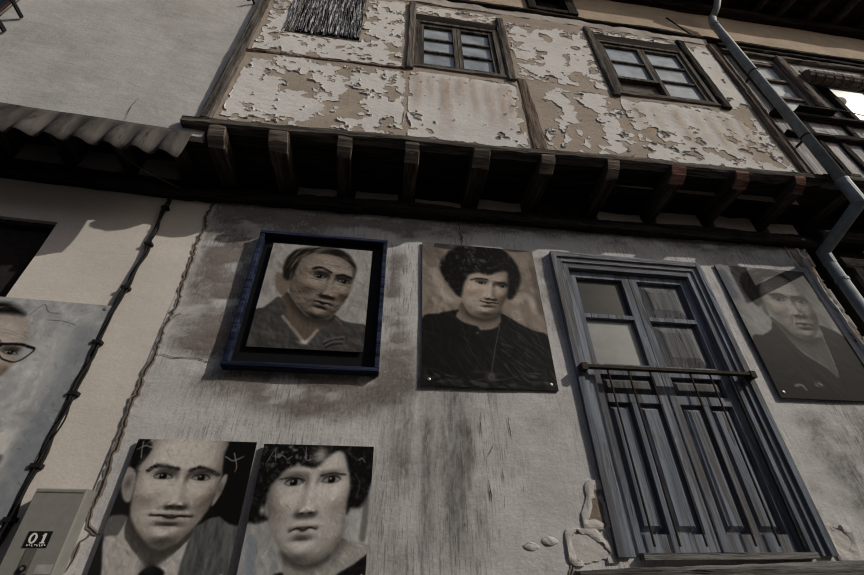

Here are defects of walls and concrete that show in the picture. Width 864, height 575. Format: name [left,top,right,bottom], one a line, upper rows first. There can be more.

peeling [220,0,798,172]
crack [65,203,216,573]
flaking render [564,480,615,567]